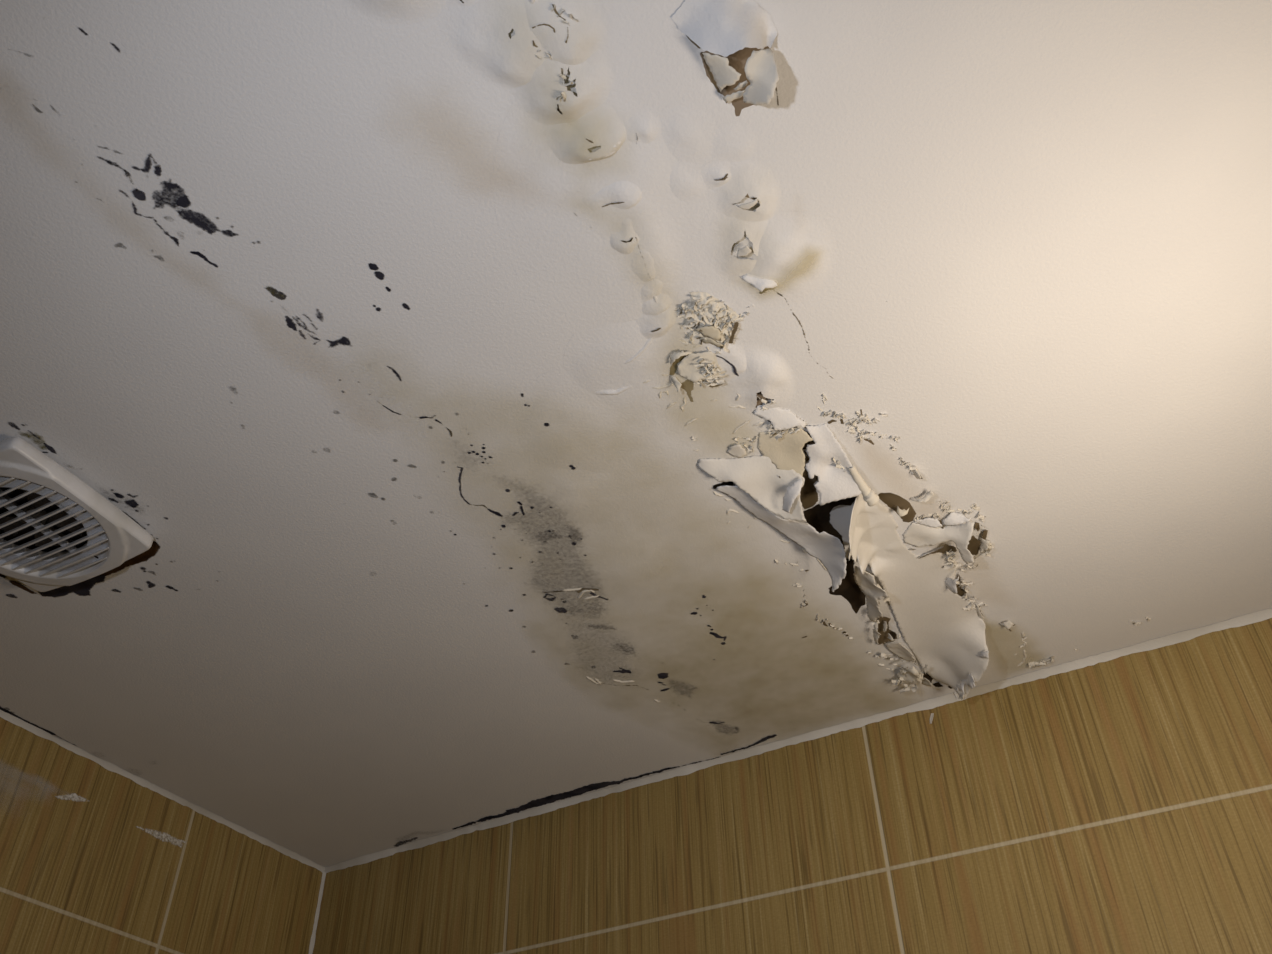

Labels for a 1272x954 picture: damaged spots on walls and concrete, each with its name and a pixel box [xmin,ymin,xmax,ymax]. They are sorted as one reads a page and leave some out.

peeling [643,291,994,700]
water stain [543,588,608,613]
water stain [603,668,669,691]
water stain [616,735,777,784]
water stain [453,807,522,830]